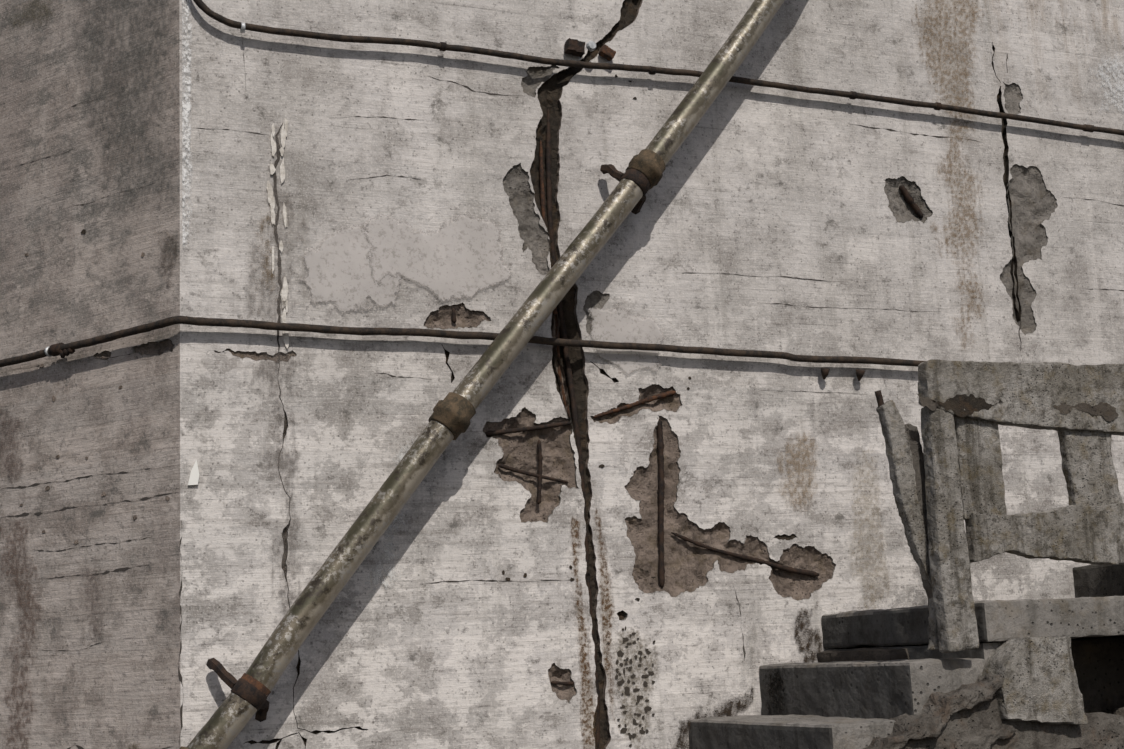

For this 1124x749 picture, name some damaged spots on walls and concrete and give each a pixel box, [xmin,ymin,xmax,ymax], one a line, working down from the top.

crack [429,0,643,268]
spalling [503,163,550,275]
spalling [884,176,933,223]
spalling [424,302,492,330]
crack [2,465,176,517]
crack [278,357,291,609]
crack [426,283,619,749]
spalling [483,407,578,523]
spalling [590,377,836,601]
crack [161,521,184,749]
crack [245,650,368,749]
spalling [548,663,577,703]